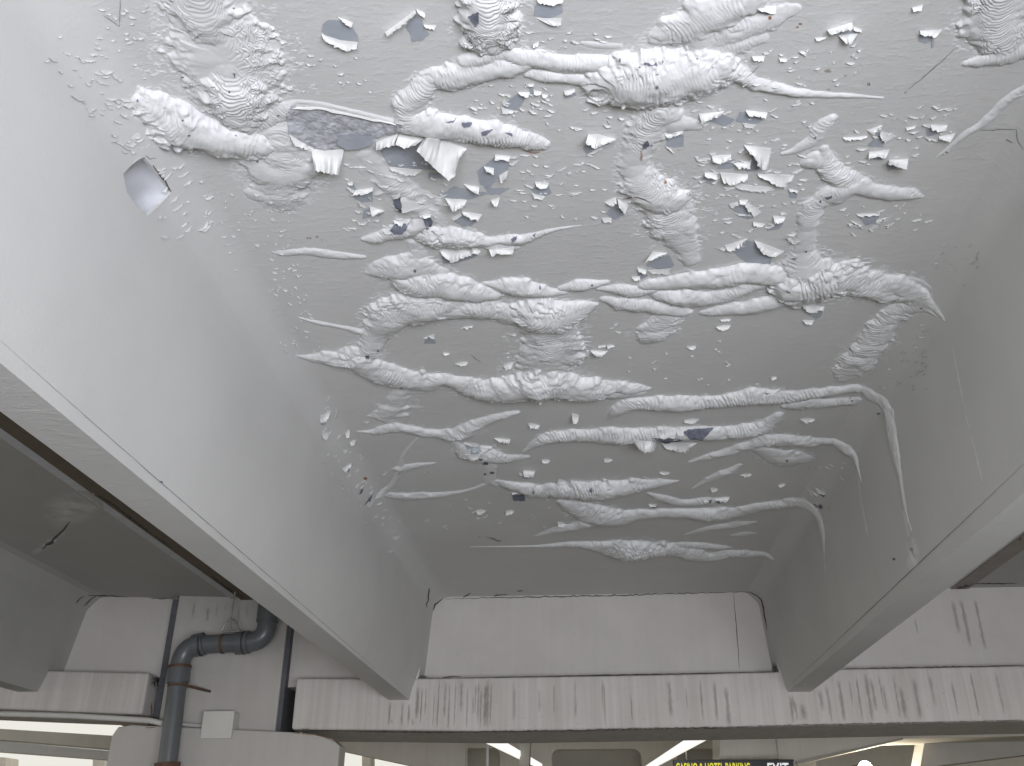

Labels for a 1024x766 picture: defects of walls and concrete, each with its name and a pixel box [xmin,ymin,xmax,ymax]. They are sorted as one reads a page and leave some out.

peeling [321,17,359,59]
peeling [385,9,436,42]
peeling [522,0,580,53]
peeling [758,5,776,15]
peeling [731,22,862,88]
peeling [919,30,942,48]
peeling [286,84,628,235]
peeling [691,99,807,264]
peeling [843,104,956,171]
peeling [440,247,514,264]
peeling [632,252,674,281]
crack [1,341,380,673]